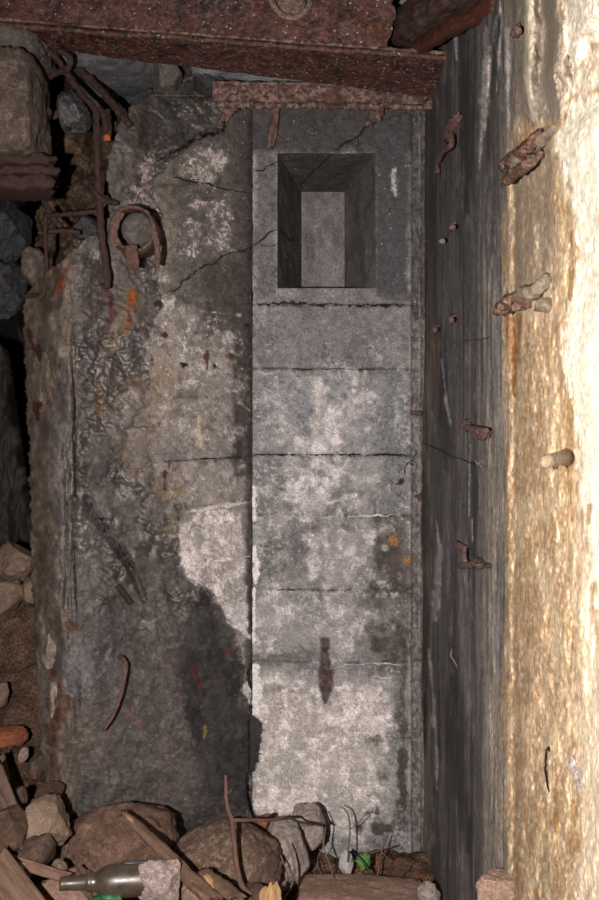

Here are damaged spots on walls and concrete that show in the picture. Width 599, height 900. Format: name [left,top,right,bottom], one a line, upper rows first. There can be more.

rust [108,204,162,270]
crack [153,114,297,296]
crack [300,112,411,187]
leakage [483,18,511,171]
crack [271,511,400,519]
leakage [462,445,478,557]
crack [245,661,253,712]
leakage [175,368,409,847]
rust [319,637,334,704]
leakage [421,454,472,854]